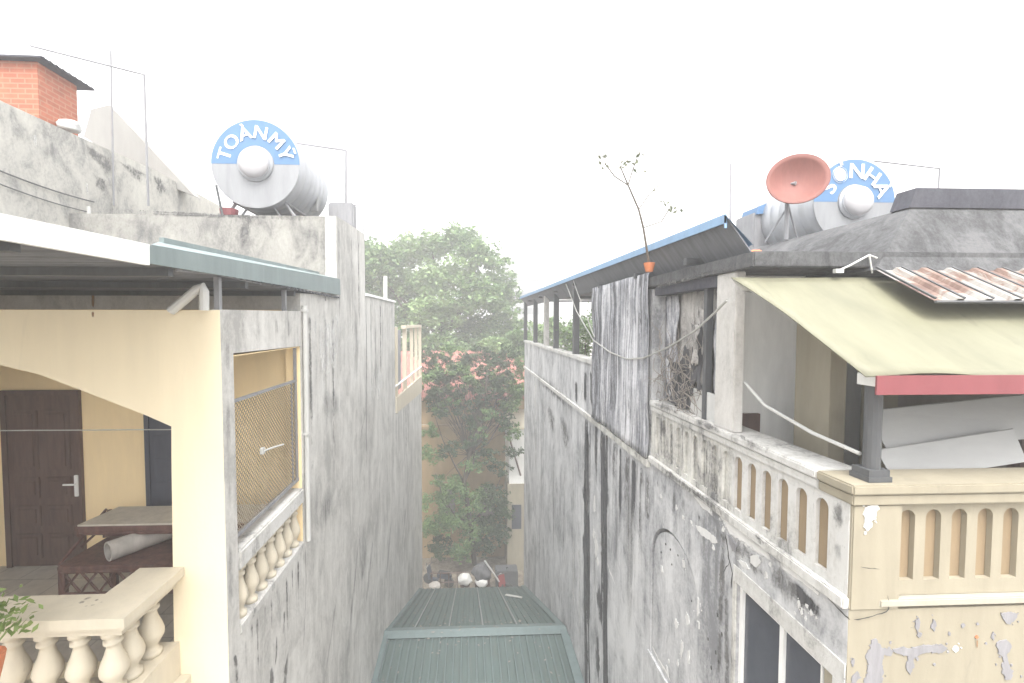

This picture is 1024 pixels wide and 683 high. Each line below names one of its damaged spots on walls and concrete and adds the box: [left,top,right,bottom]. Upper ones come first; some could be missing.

leakage [649,403,707,473]
leakage [573,422,819,683]
peeling [862,505,880,535]
flaking render [794,598,818,621]
peeling [844,615,980,683]
peeling [984,632,1023,680]